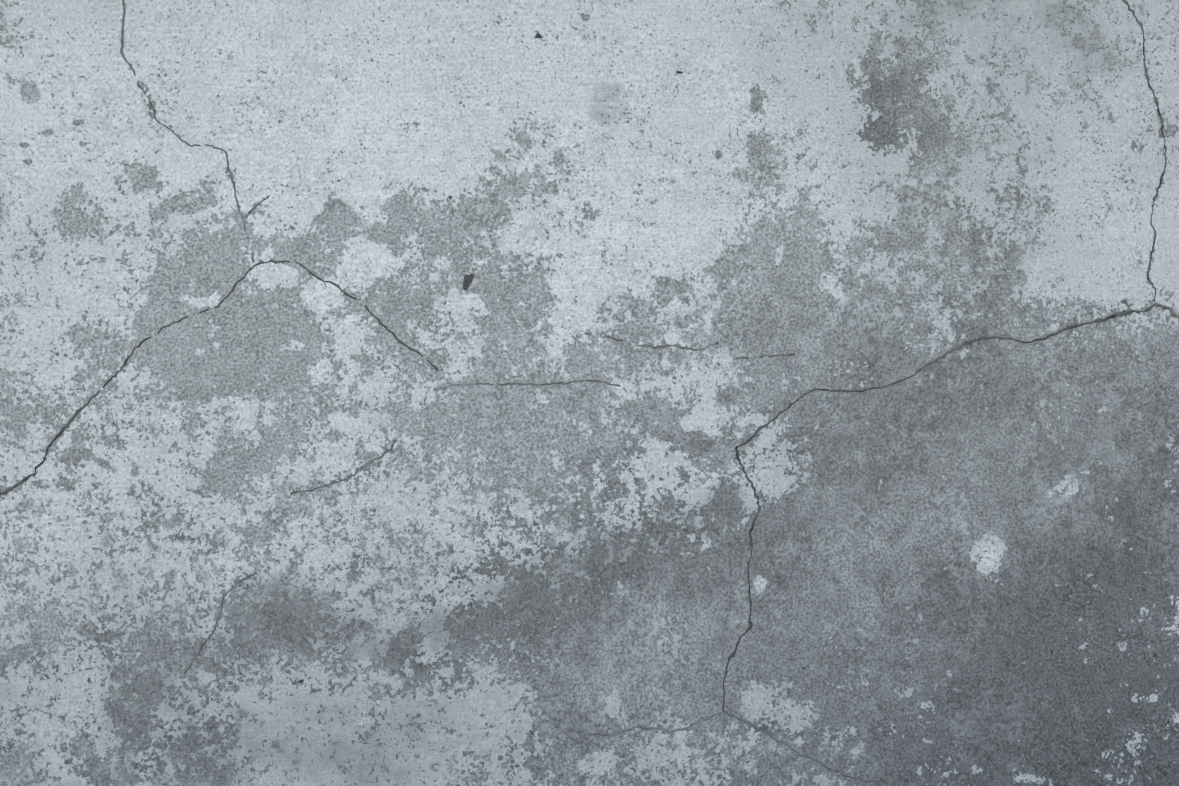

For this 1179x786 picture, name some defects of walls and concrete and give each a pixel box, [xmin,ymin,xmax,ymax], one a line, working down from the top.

crack [185,572,256,674]
crack [0,0,619,496]
crack [584,0,1179,786]